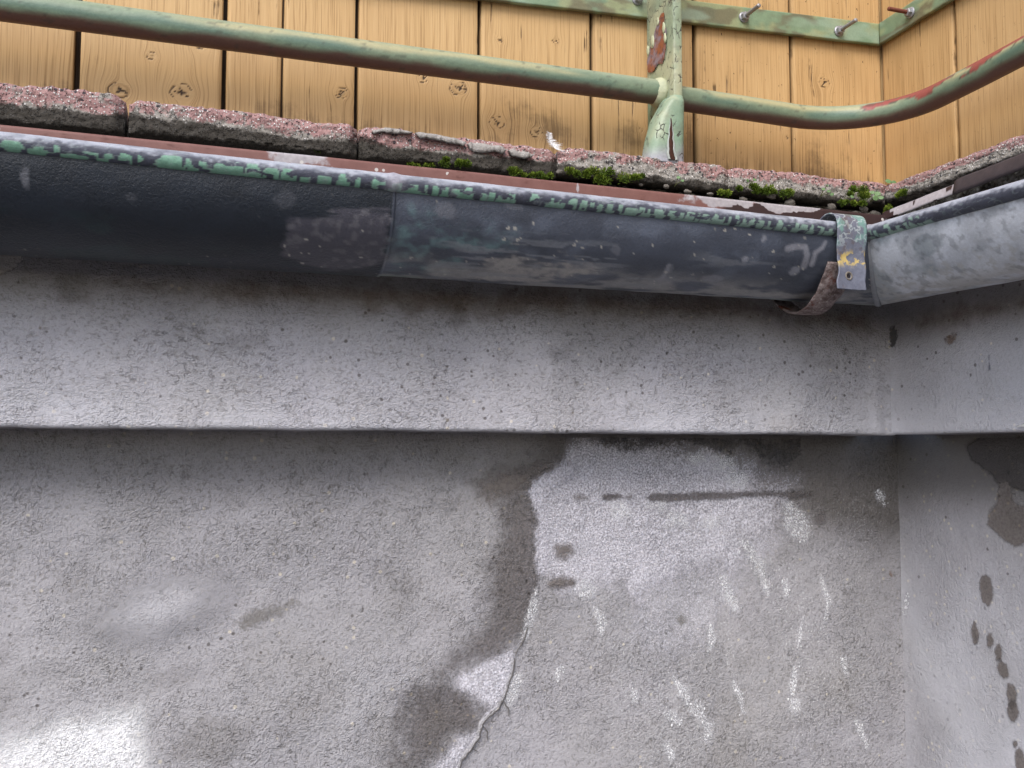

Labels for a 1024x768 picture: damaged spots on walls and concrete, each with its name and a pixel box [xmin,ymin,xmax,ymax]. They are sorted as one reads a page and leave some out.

leakage [967,438,1024,547]
leakage [389,438,825,768]
leakage [980,575,993,606]
crack [457,627,528,768]
leakage [971,622,1019,722]
leakage [1013,741,1024,768]